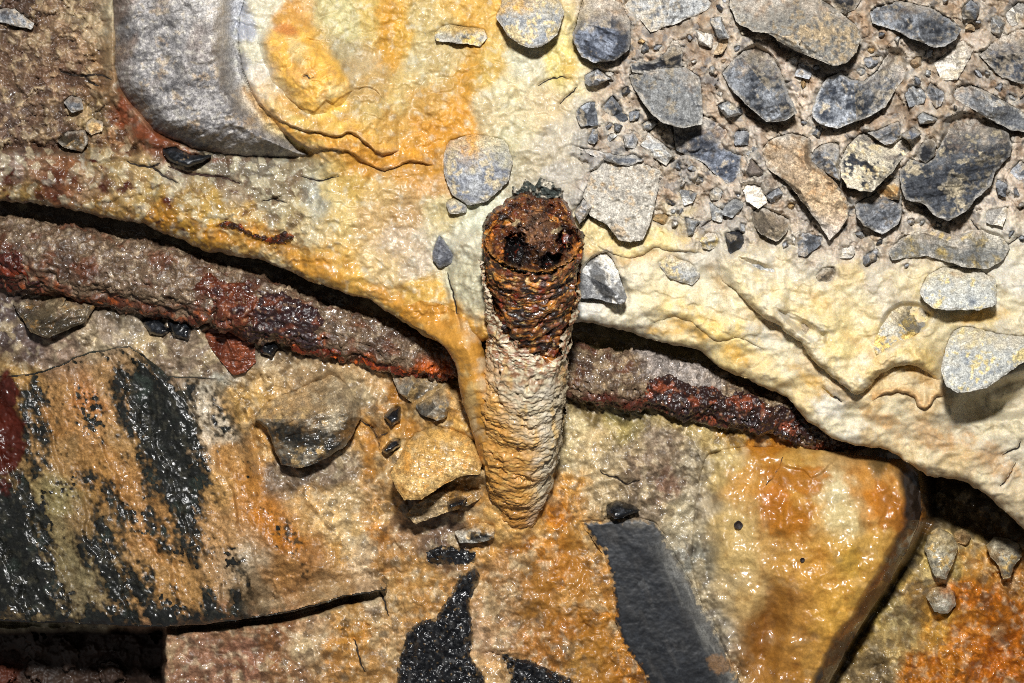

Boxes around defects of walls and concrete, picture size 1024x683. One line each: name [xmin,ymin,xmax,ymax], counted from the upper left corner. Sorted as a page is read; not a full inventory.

spalling [687,0,746,74]
spalling [961,0,1024,37]
spalling [584,68,614,86]
spalling [576,86,657,144]
spalling [904,49,957,124]
spalling [653,130,795,254]
spalling [782,233,822,257]
spalling [840,231,882,266]
rust [0,214,458,382]
spalling [478,177,585,530]
rust [566,341,868,452]
crack [354,639,366,672]